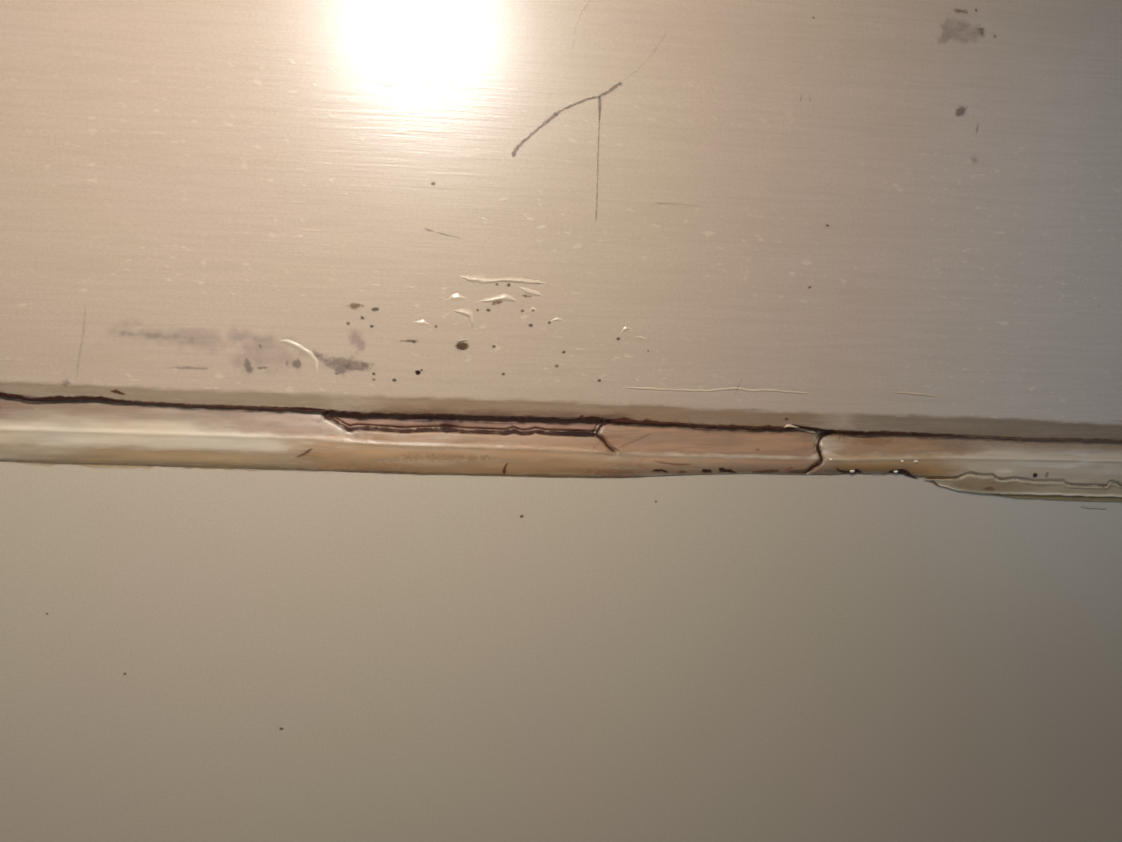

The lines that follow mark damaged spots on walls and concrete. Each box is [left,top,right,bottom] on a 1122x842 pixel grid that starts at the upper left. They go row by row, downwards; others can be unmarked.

crack [0,390,330,412]
spalling [324,409,602,436]
crack [581,415,1122,476]